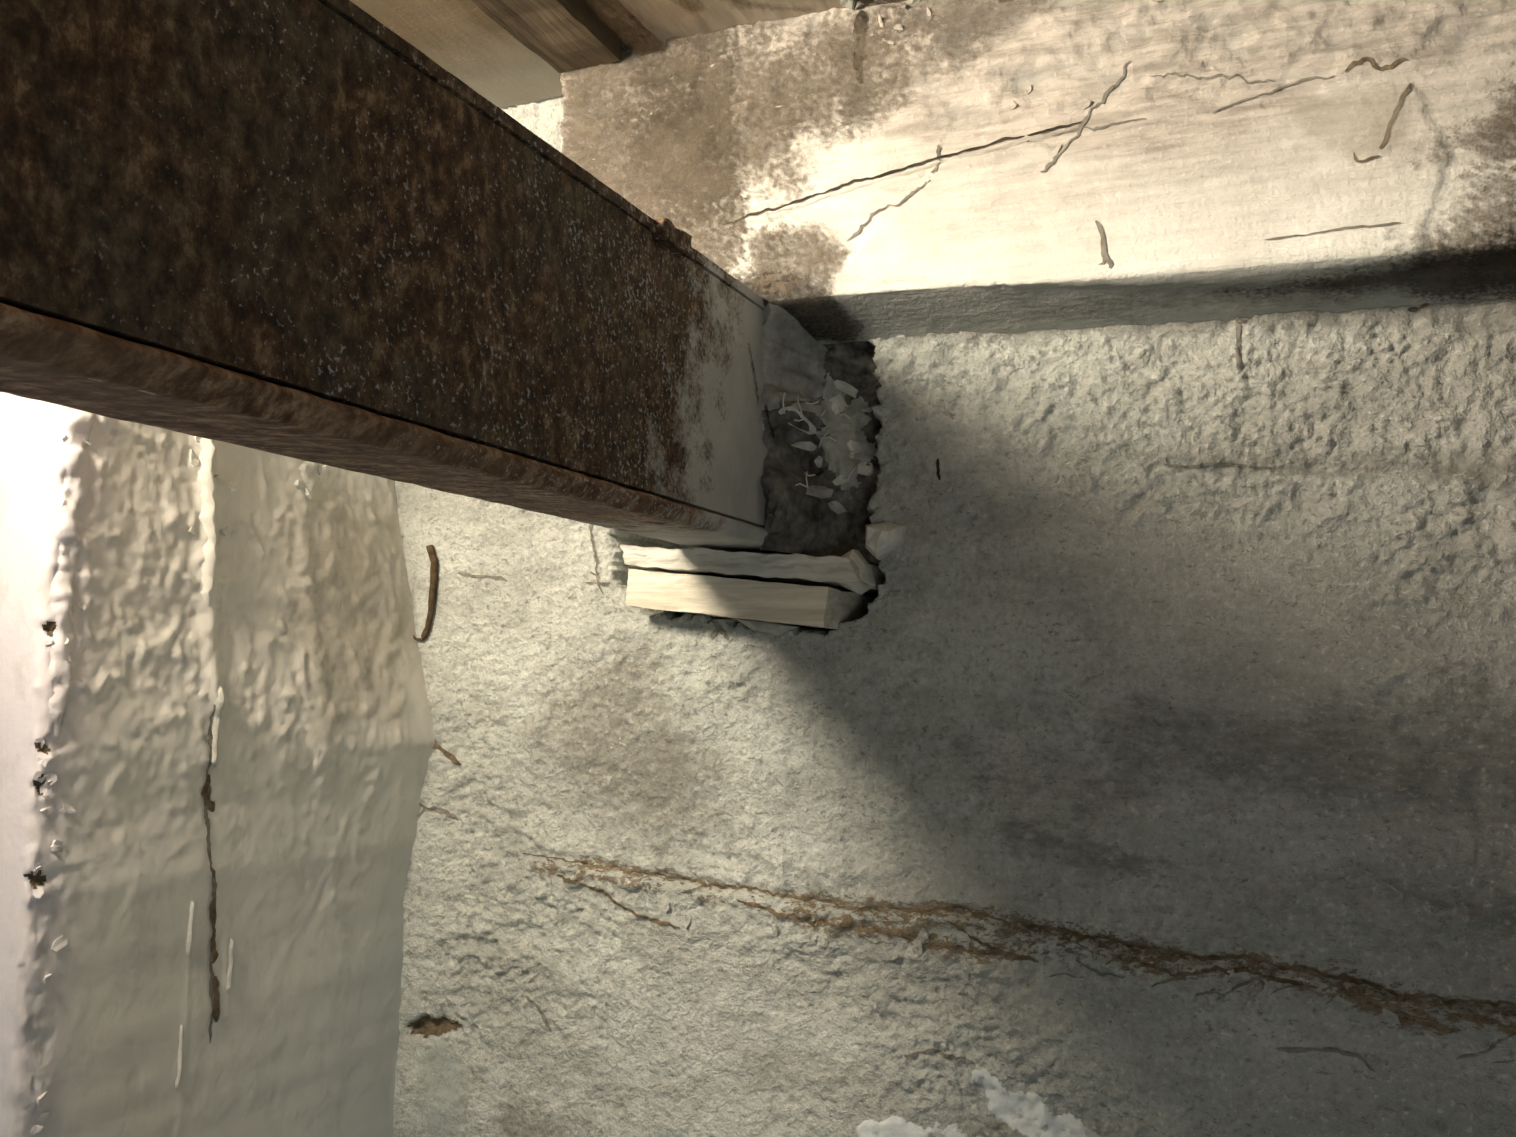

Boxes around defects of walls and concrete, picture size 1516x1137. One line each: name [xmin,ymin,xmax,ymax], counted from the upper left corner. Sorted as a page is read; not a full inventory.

crack [724,57,1412,241]
crack [1095,220,1113,268]
water stain [1223,166,1516,301]
spalling [759,303,882,564]
crack [175,685,234,1090]
crack [518,853,1516,1072]
peeling [854,1116,984,1137]
peeling [971,1068,1102,1137]